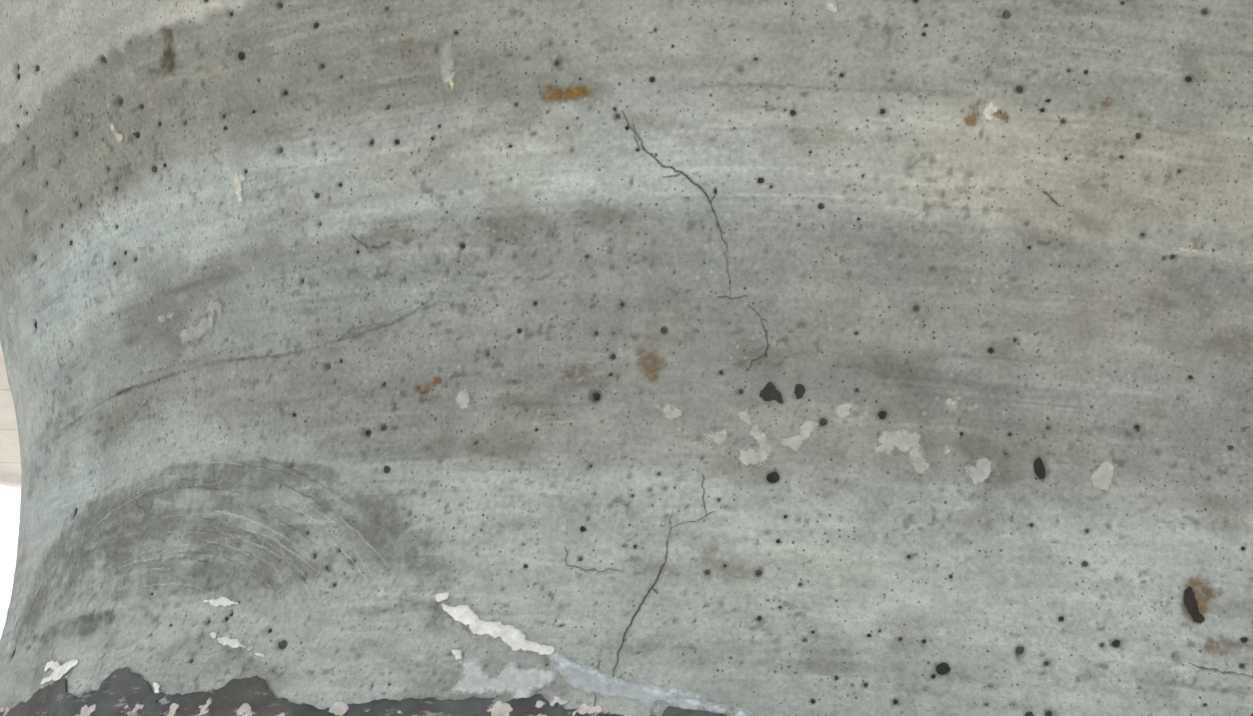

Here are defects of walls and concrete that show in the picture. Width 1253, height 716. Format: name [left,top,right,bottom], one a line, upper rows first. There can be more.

rust [542,87,589,101]
crack [622,111,727,245]
crack [716,295,768,371]
spalling [759,382,806,404]
spalling [837,403,851,418]
spalling [707,430,727,456]
spalling [737,411,818,465]
spalling [875,429,929,474]
spalling [965,458,991,484]
crack [594,473,715,707]
peeling [0,592,748,716]